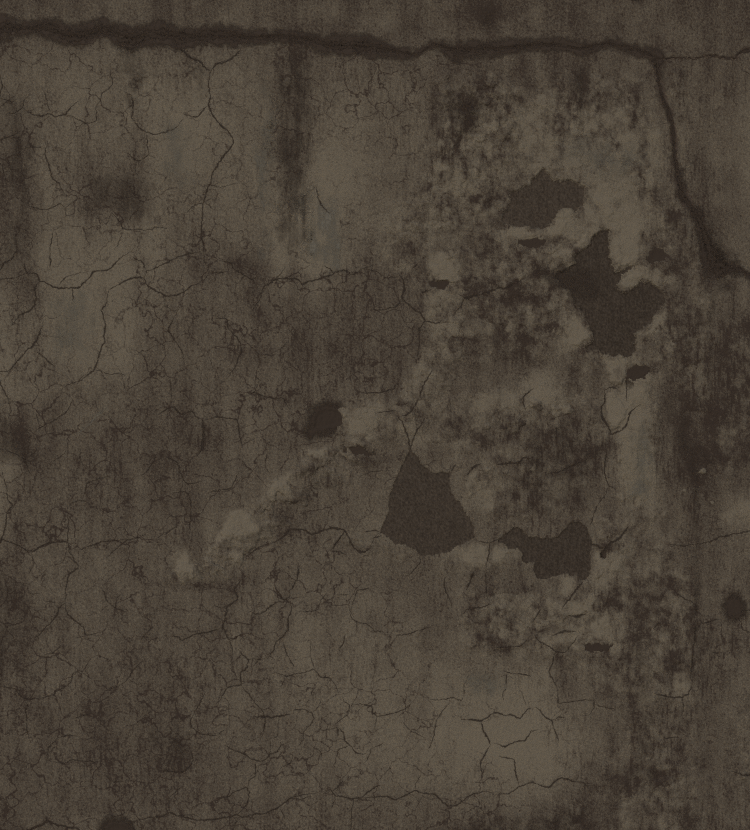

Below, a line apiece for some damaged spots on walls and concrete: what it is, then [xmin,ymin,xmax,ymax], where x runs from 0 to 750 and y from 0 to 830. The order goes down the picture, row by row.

crack [0,20,750,456]
flaking render [360,65,750,492]
crack [0,456,237,655]
crack [251,527,379,554]
crack [129,569,614,830]
spalling [380,449,475,557]
crack [444,539,498,613]
crack [452,457,530,475]
flaking render [429,519,720,830]
crack [590,379,639,551]
crack [657,594,718,705]
crack [26,818,79,830]